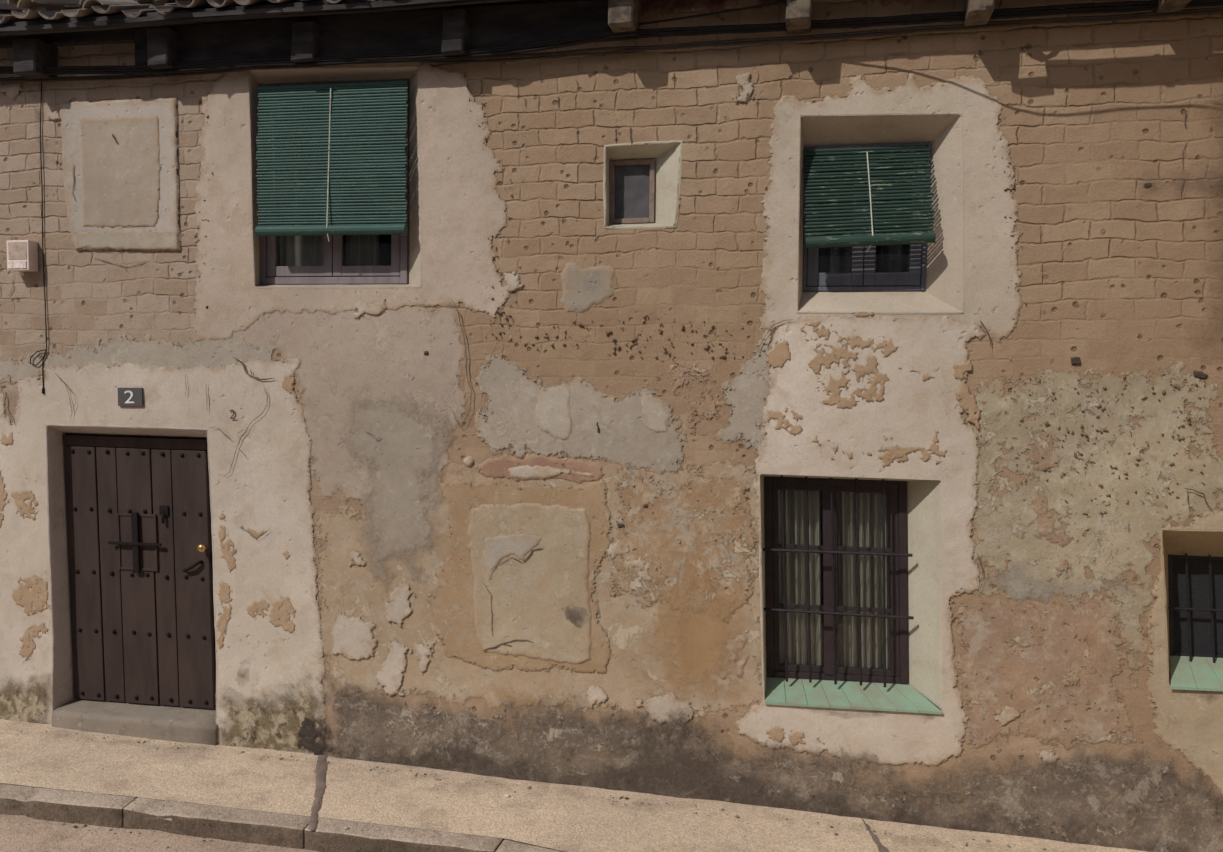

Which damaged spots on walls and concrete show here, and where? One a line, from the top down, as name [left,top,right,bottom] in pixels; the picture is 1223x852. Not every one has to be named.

peeling [766,339,791,368]
peeling [800,320,935,409]
peeling [0,469,38,528]
crack [185,357,274,476]
flaking render [232,298,764,682]
peeling [764,407,947,467]
flaking render [1012,371,1208,587]
peeling [11,575,51,661]
peeling [216,511,296,649]
crack [482,548,543,651]
leakage [0,676,50,724]
leakage [219,676,1223,852]